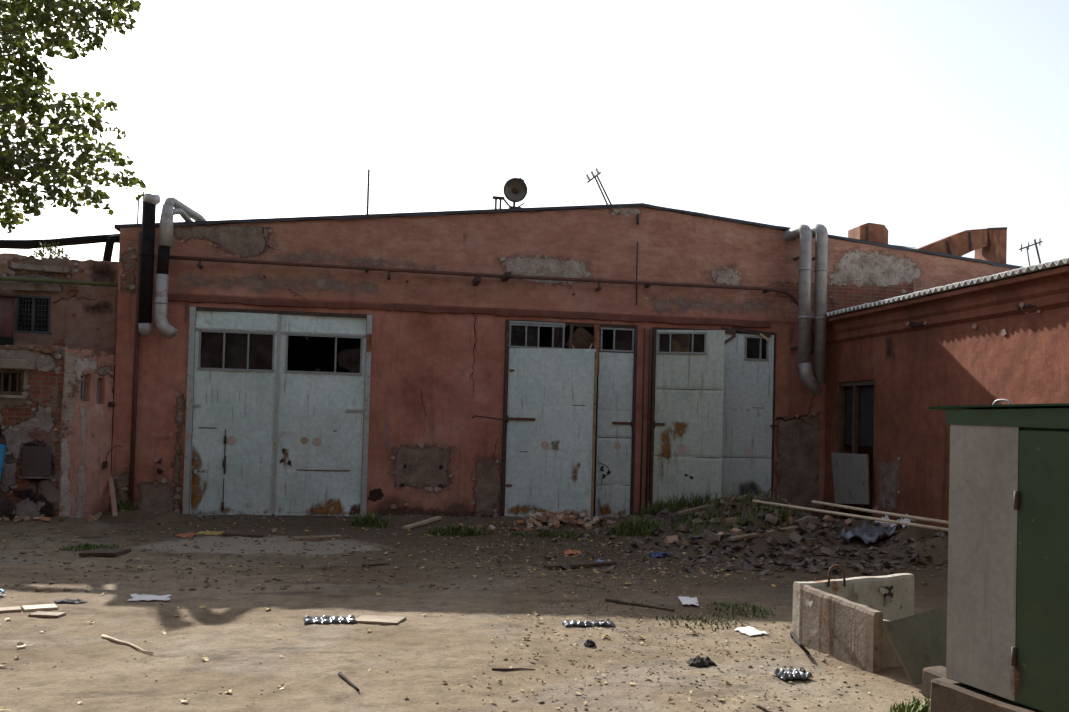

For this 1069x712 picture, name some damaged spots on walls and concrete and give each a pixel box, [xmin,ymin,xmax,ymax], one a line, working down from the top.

peeling [173,224,276,260]
spalling [500,253,592,286]
spalling [773,249,922,312]
spalling [0,350,130,522]
peeling [153,393,186,510]
spalling [389,443,457,492]